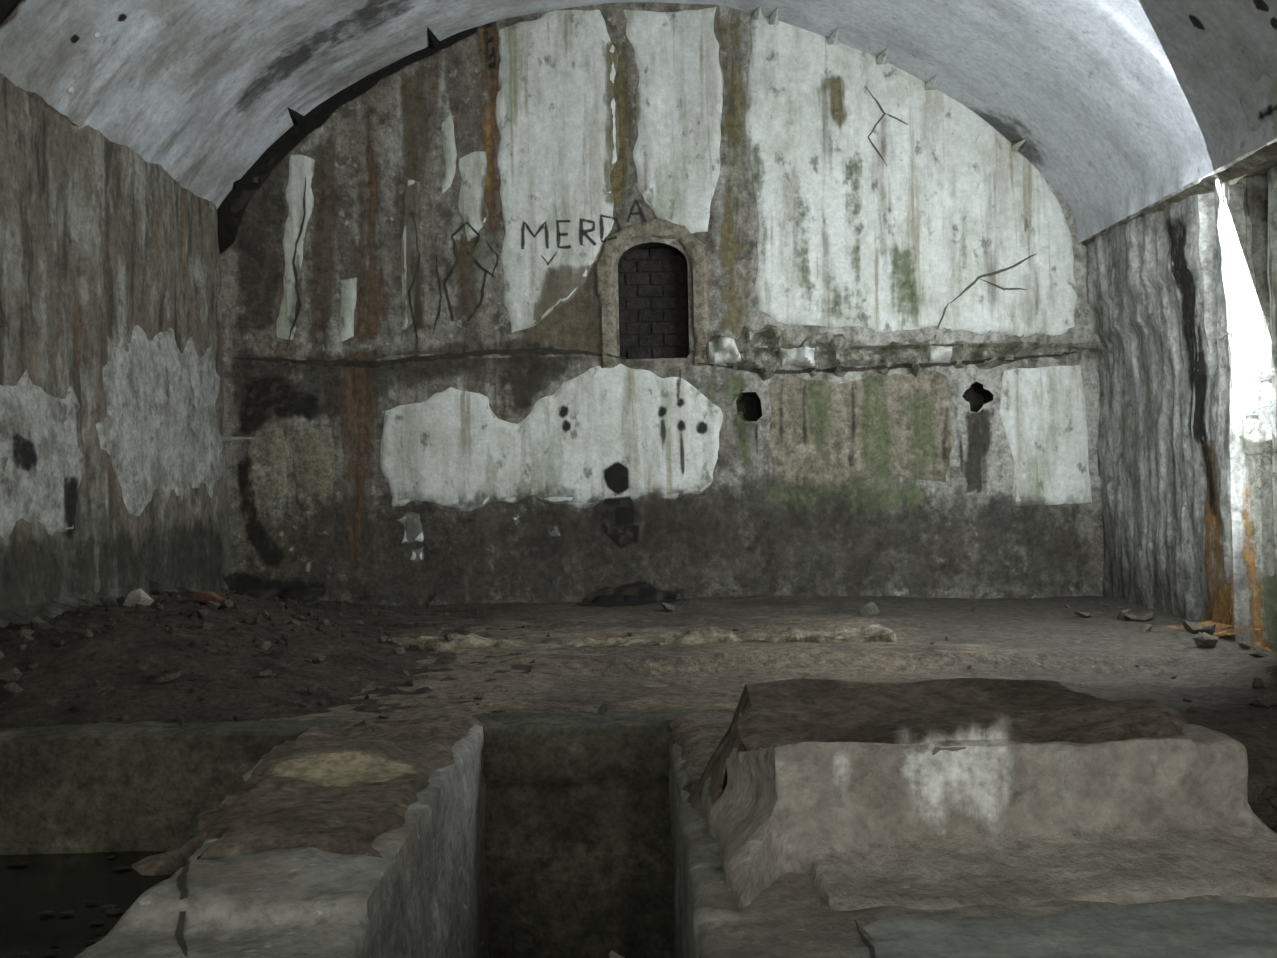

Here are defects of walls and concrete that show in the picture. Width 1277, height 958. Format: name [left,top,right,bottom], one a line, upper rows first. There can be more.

peeling [276,155,315,340]
peeling [339,277,358,342]
water stain [217,22,498,333]
water stain [234,266,602,435]
crack [235,177,626,367]
peeling [380,7,741,560]
water stain [605,42,639,208]
water stain [658,370,708,474]
crack [698,253,1077,374]
water stain [0,406,1083,628]
rust [1164,444,1277,654]
water stain [904,730,1010,825]